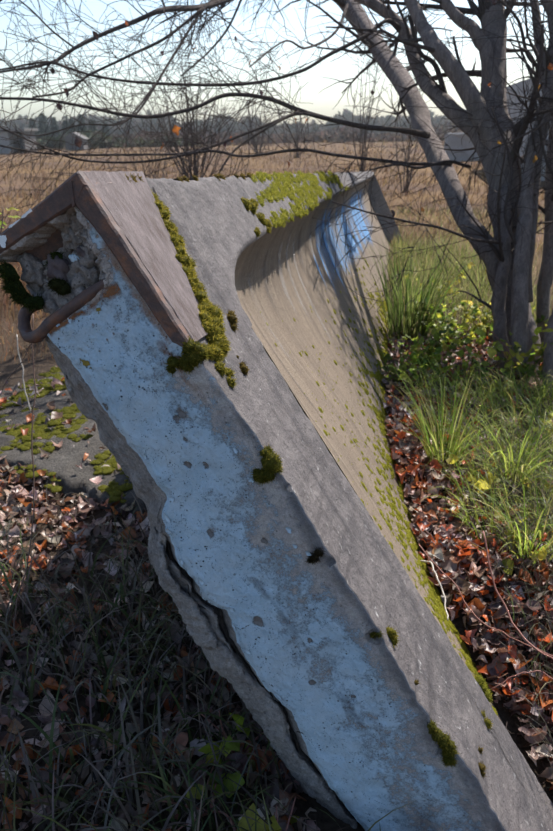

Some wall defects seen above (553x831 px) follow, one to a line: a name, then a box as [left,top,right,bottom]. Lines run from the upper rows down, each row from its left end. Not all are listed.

rust [102,283,120,298]
peeling [314,192,371,291]
peeling [0,207,480,831]
crack [167,540,325,781]